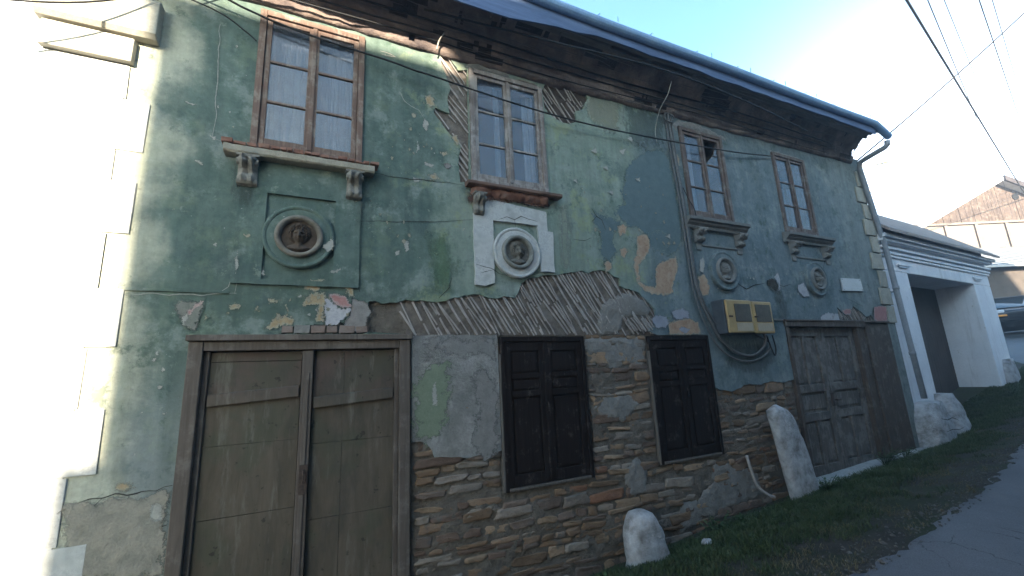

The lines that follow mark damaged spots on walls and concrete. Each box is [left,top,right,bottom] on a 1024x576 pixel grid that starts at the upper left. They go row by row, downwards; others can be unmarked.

peeling [591,136,684,297]
peeling [175,300,209,331]
flaking render [254,268,372,334]
flaking render [410,334,502,461]
flaking render [59,482,170,576]
crack [82,485,173,506]